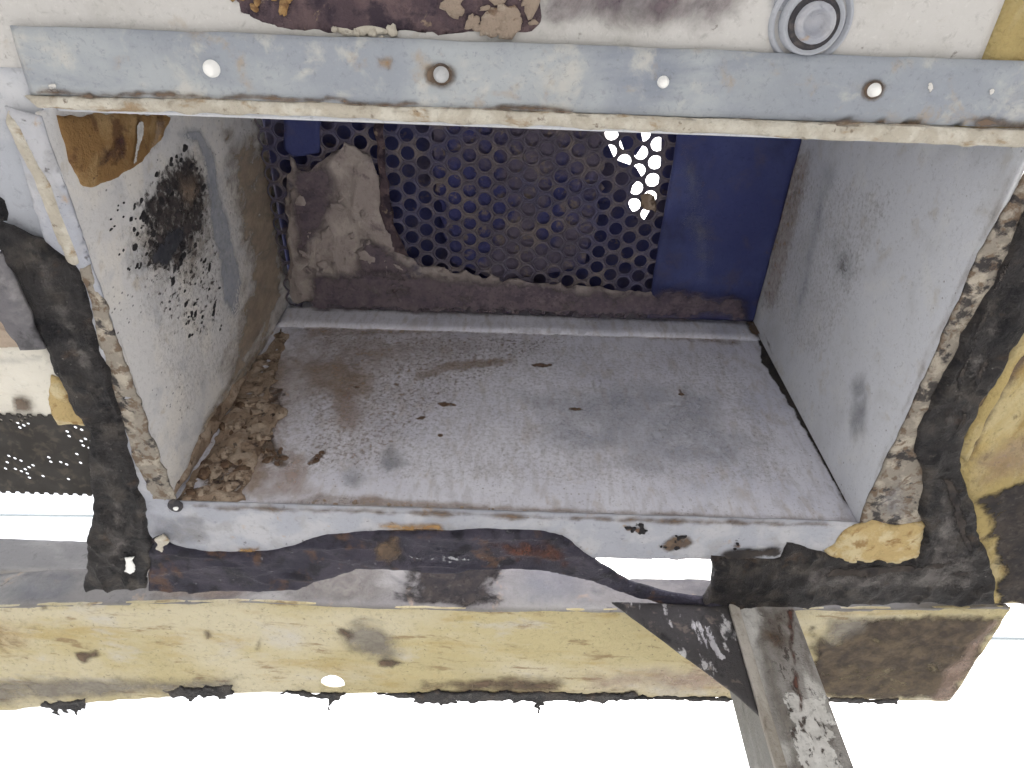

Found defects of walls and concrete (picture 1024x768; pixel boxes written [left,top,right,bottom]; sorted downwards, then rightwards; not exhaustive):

leakage [109,132,241,338]
corrosion [174,135,552,510]
corrosion [305,499,537,561]
corrosion [573,514,713,524]